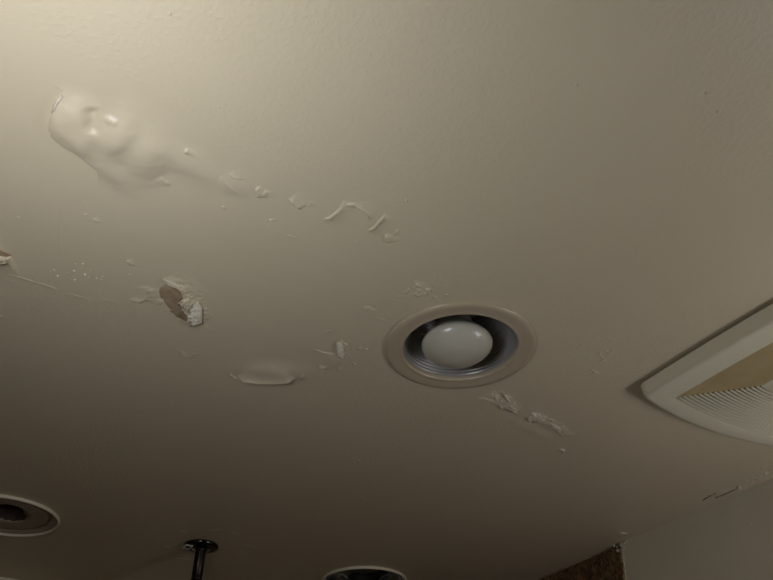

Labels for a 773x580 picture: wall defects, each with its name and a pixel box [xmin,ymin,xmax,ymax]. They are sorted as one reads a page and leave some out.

peeling [129,271,218,332]